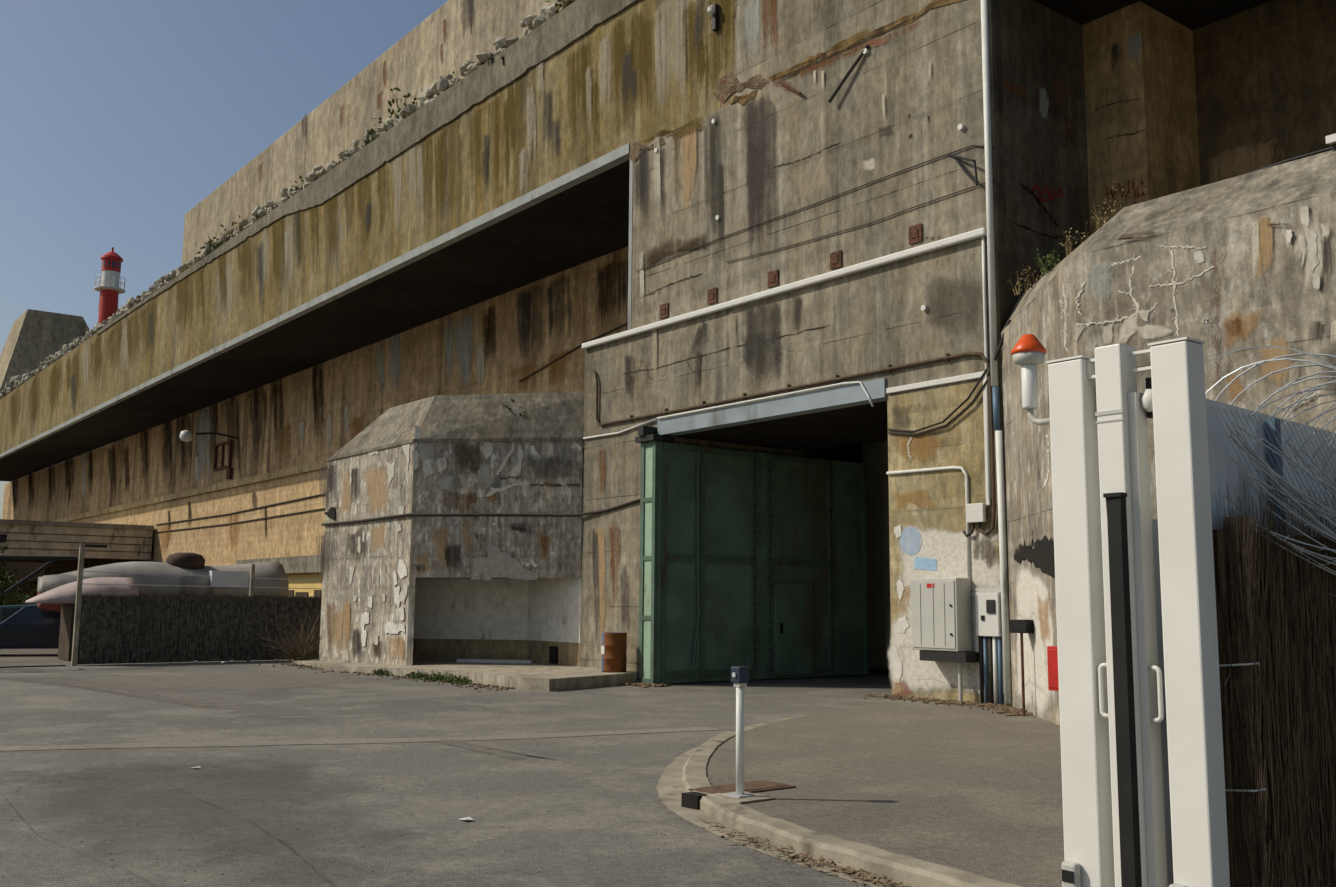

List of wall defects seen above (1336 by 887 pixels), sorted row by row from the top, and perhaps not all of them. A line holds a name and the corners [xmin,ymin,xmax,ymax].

damp [422,47,597,204]
damp [640,141,662,209]
damp [677,117,722,236]
damp [596,236,698,316]
crack [1059,243,1216,351]
peeling [1286,206,1329,290]
damp [10,298,156,431]
damp [12,365,349,505]
peeling [324,471,351,520]
peeling [348,425,551,647]
peeling [892,616,910,695]
peeling [1014,530,1055,717]